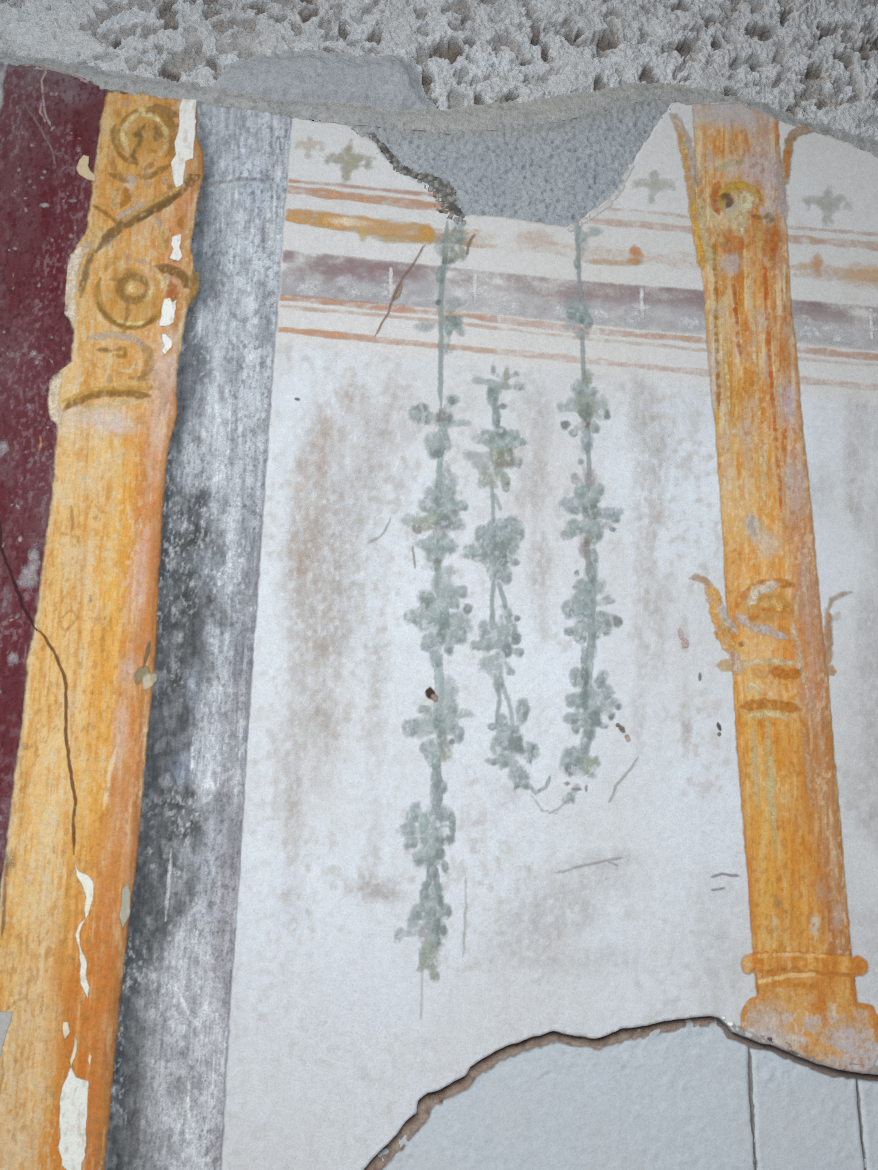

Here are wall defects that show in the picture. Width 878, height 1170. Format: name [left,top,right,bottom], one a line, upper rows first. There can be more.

peeling [76,155,96,182]
peeling [171,99,196,187]
flaking render [345,93,675,231]
peeling [159,298,176,354]
peeling [170,234,182,261]
crack [376,245,425,334]
crack [0,525,77,855]
peeling [75,866,93,997]
peeling [119,884,130,928]
peeling [0,1011,13,1056]
peeling [58,1022,92,1170]
crack [364,1016,878,1170]